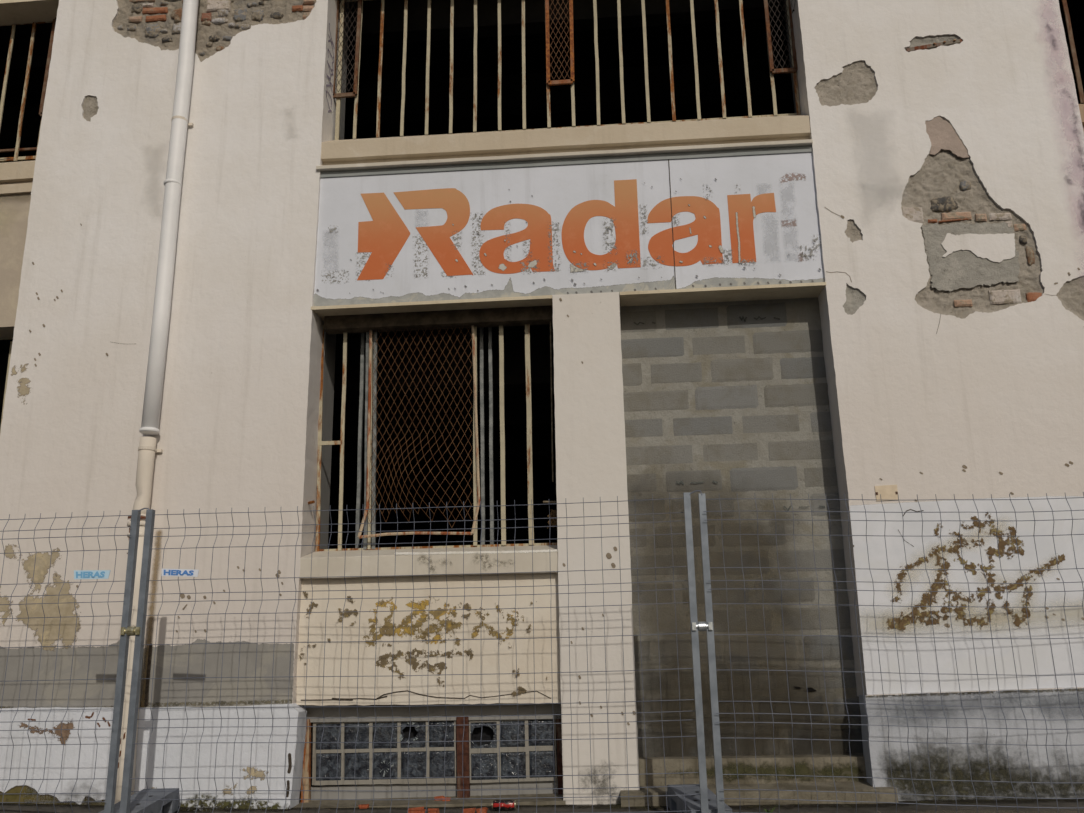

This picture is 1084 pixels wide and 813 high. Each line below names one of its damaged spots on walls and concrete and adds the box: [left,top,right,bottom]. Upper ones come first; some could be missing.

flaking render [113,0,183,51]
flaking render [195,0,316,62]
flaking render [905,35,962,52]
flaking render [82,96,99,121]
flaking render [815,61,878,106]
flaking render [901,116,1084,320]
flaking render [843,284,866,315]
peeling [0,545,81,651]
peeling [337,596,531,687]
peeling [19,720,75,744]
leakage [728,747,1084,809]
leakage [516,799,670,809]